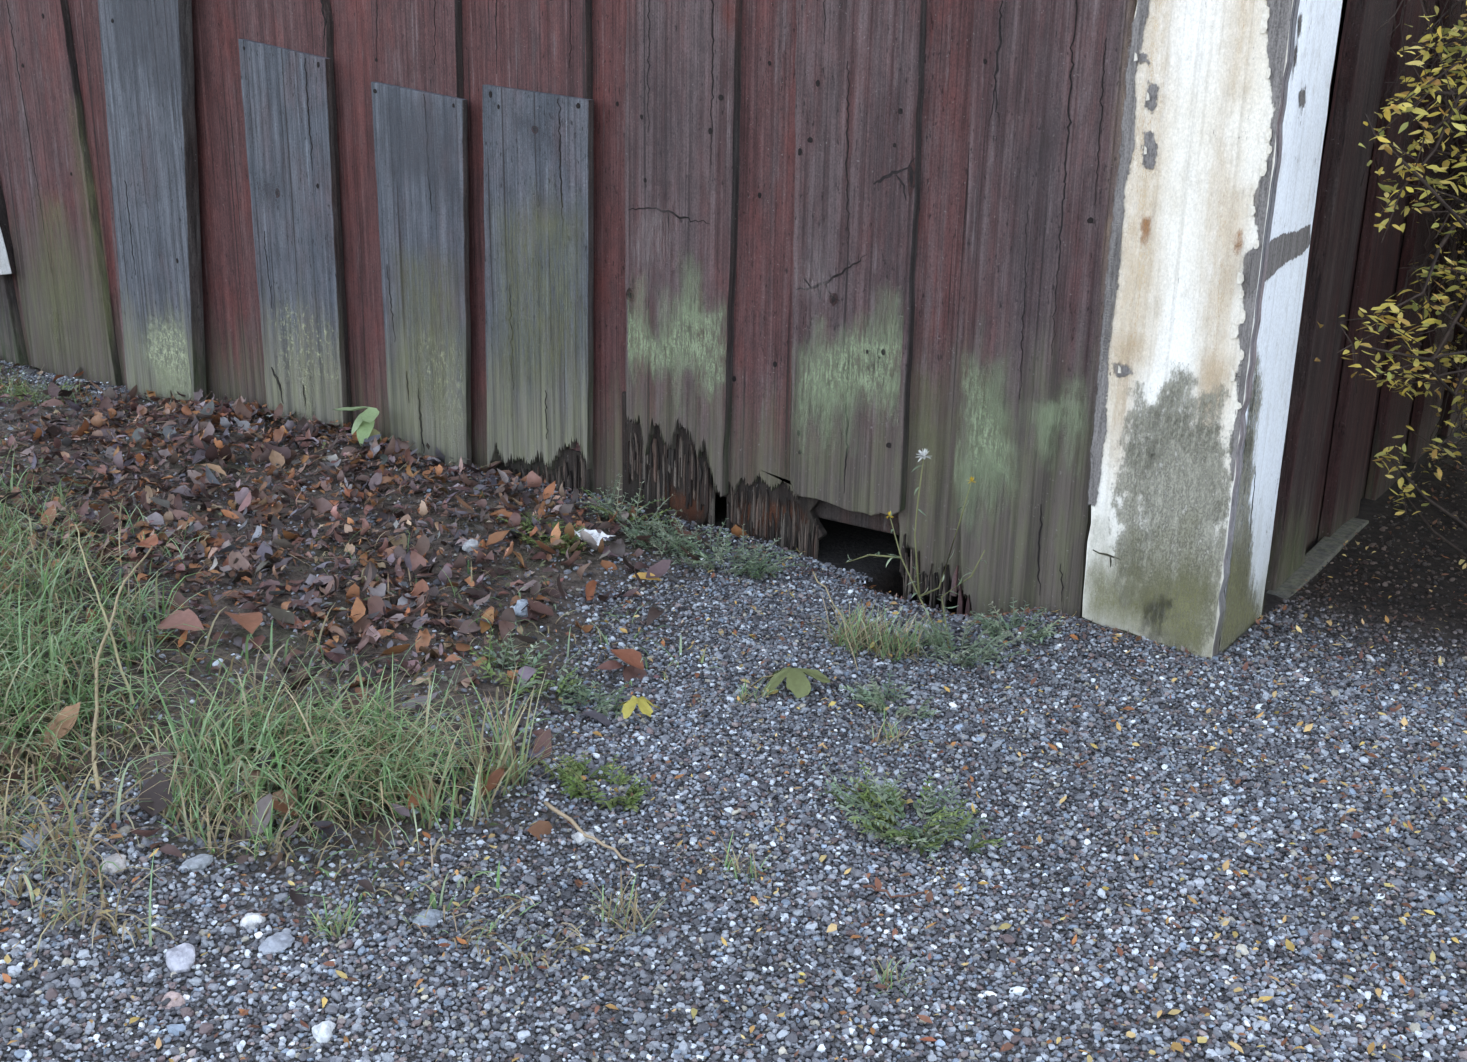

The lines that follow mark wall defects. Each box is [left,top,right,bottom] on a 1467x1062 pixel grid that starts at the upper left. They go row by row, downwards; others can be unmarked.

crack [629,207,710,227]
crack [796,61,915,301]
peeling [1088,0,1311,657]